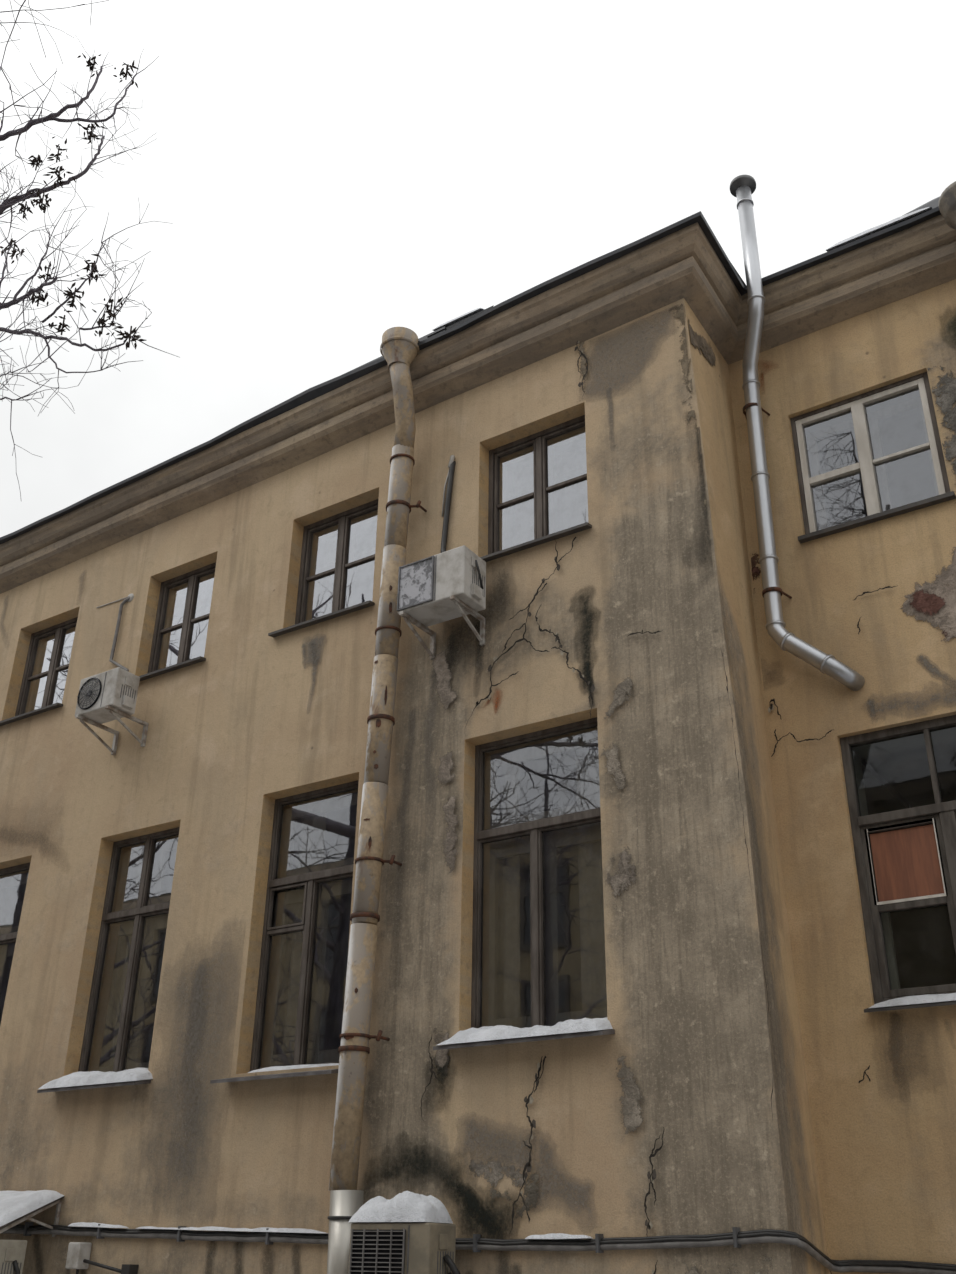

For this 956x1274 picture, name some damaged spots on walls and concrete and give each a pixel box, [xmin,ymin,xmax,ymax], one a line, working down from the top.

peeling [928,366,956,479]
crack [466,537,595,725]
spalling [901,547,956,643]
water stain [369,1145,517,1239]
crack [509,1056,546,1240]
crack [644,1127,664,1274]